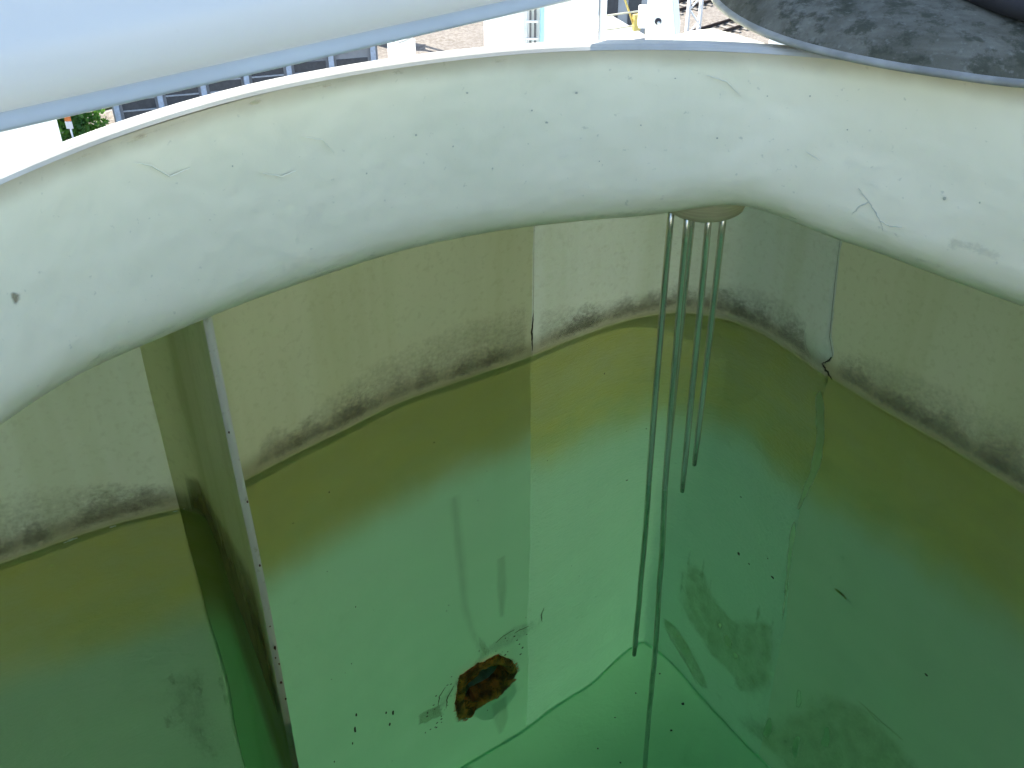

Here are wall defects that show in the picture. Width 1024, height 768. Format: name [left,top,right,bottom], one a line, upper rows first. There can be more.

crack [853,188,902,230]
crack [528,260,536,358]
crack [822,243,840,380]